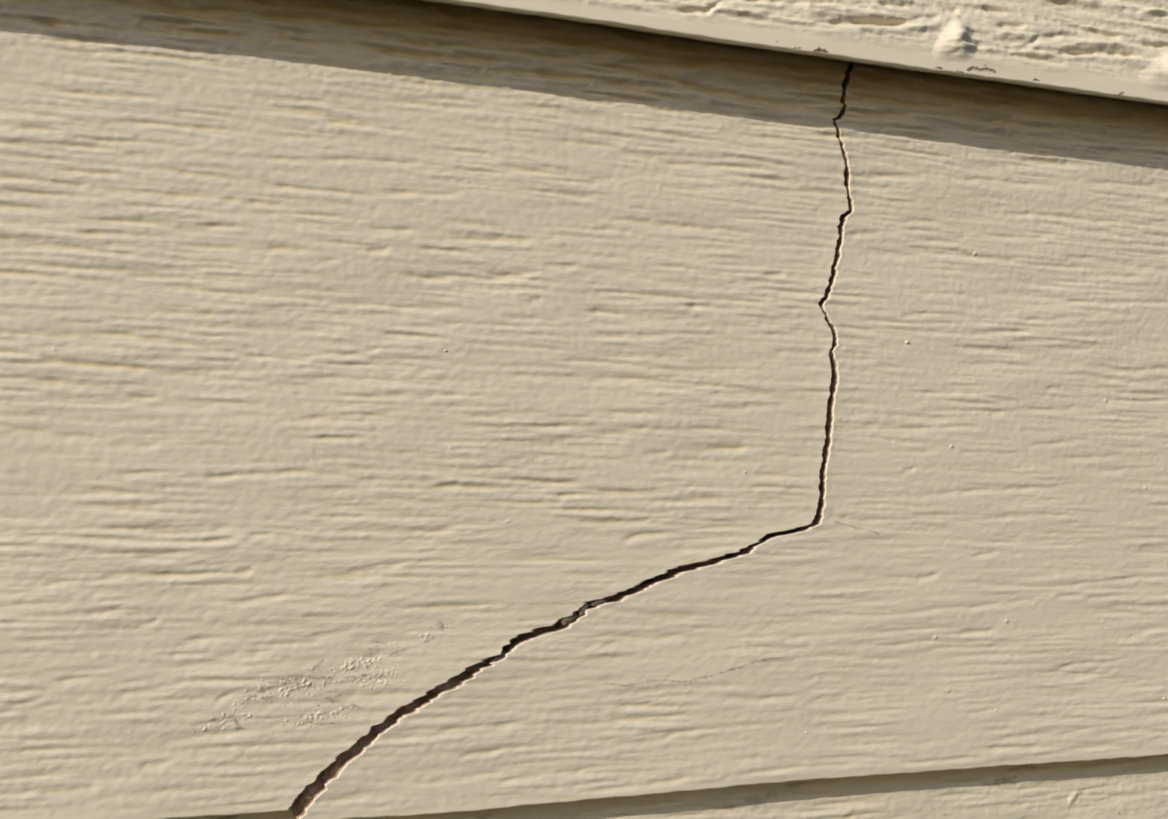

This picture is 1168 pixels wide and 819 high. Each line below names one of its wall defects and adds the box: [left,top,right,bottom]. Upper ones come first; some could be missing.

crack [289,63,854,819]